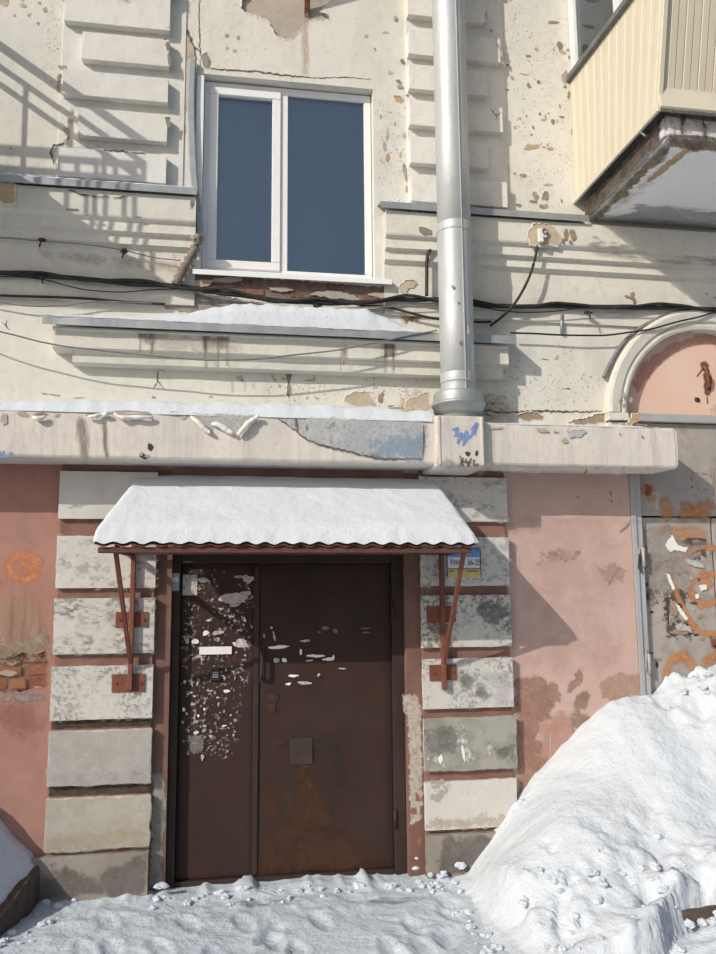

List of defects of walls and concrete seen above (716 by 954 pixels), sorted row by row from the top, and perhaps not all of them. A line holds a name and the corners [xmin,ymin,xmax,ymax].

crack [186,0,368,80]
spalling [239,0,333,41]
peeling [496,15,572,209]
spalling [526,222,576,248]
damp [202,336,228,368]
damp [384,343,394,372]
corrosion [697,361,711,404]
peeling [280,378,429,461]
crack [484,409,602,418]
flaking render [0,641,92,722]
peeling [599,649,662,702]
peeling [402,657,590,825]